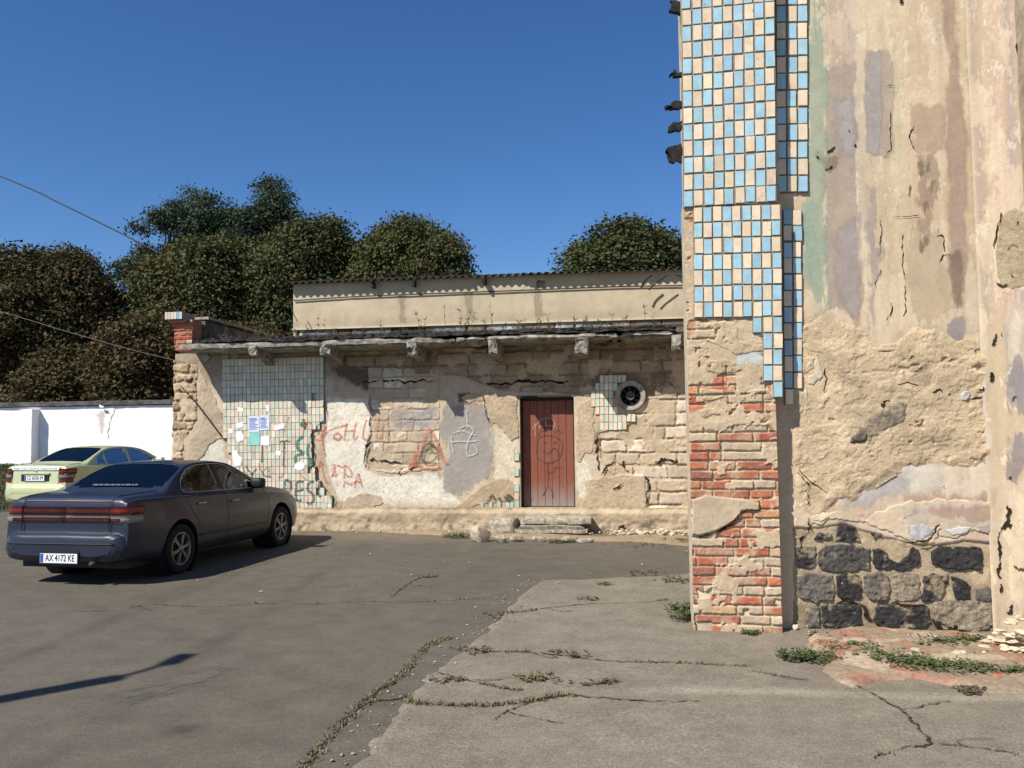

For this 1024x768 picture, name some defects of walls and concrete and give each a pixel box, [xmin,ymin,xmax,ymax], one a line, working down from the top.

flaking render [790,0,993,632]
peeling [993,208,1024,289]
flaking render [171,360,198,460]
spalling [344,320,763,508]
crack [996,476,1024,614]